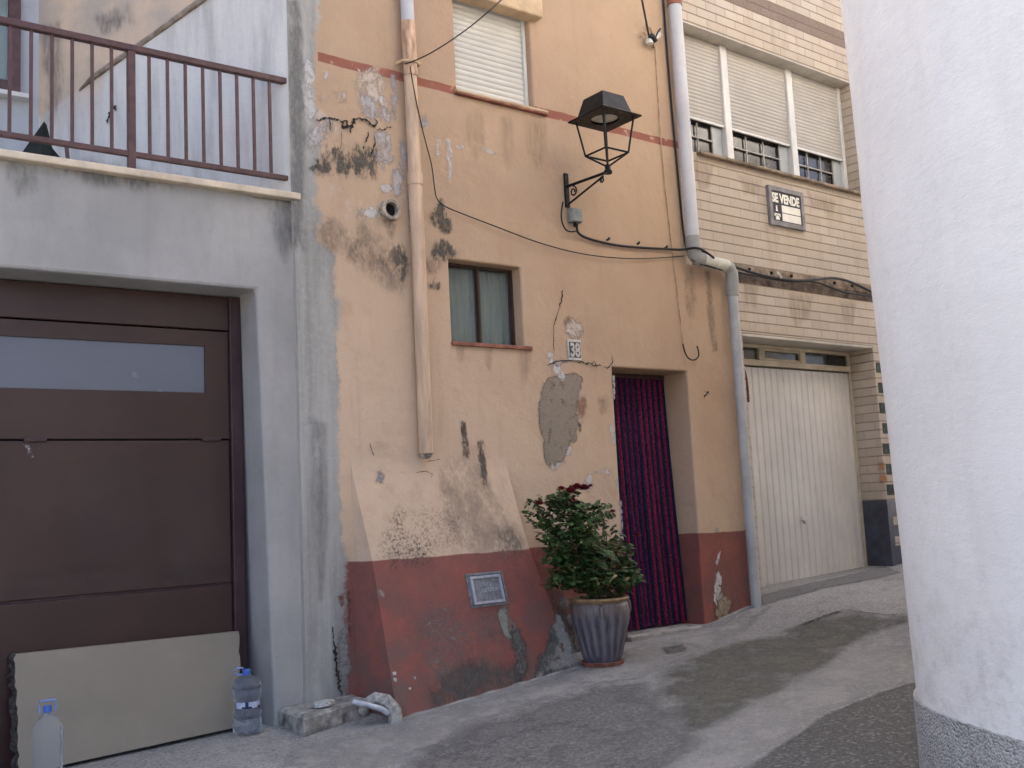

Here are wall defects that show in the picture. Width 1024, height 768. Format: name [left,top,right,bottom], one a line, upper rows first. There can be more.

water stain [83,162,149,185]
peeling [304,59,332,147]
water stain [279,1,377,248]
crack [316,117,392,157]
peeling [335,68,409,203]
water stain [349,245,408,286]
water stain [426,199,456,271]
crack [547,291,613,369]
spalling [538,352,583,471]
water stain [461,421,487,484]
spalling [714,552,732,621]
peeling [425,592,580,708]